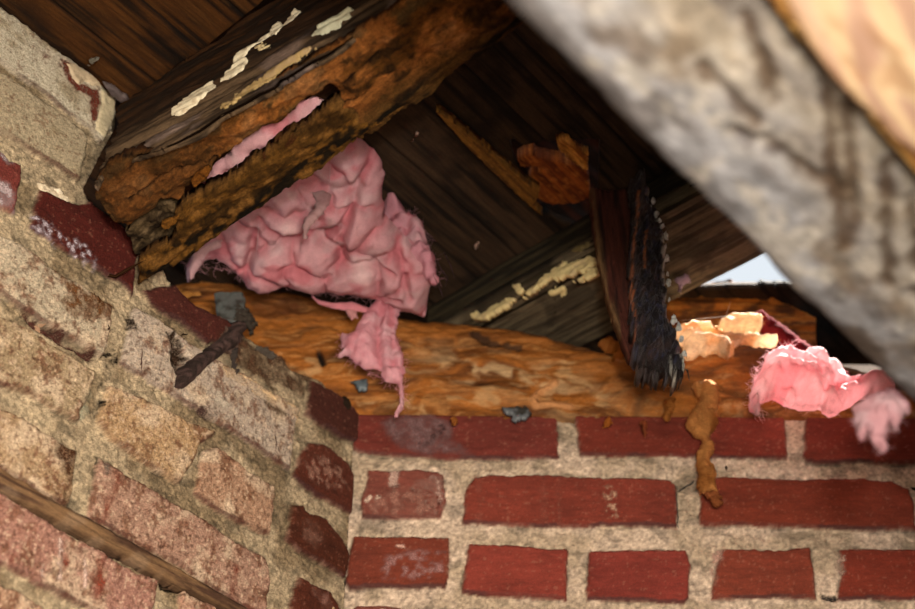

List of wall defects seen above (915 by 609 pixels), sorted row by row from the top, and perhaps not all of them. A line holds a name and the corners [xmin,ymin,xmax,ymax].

peeling [171,8,301,116]
spalling [220,7,354,109]
damp [32,216,91,258]